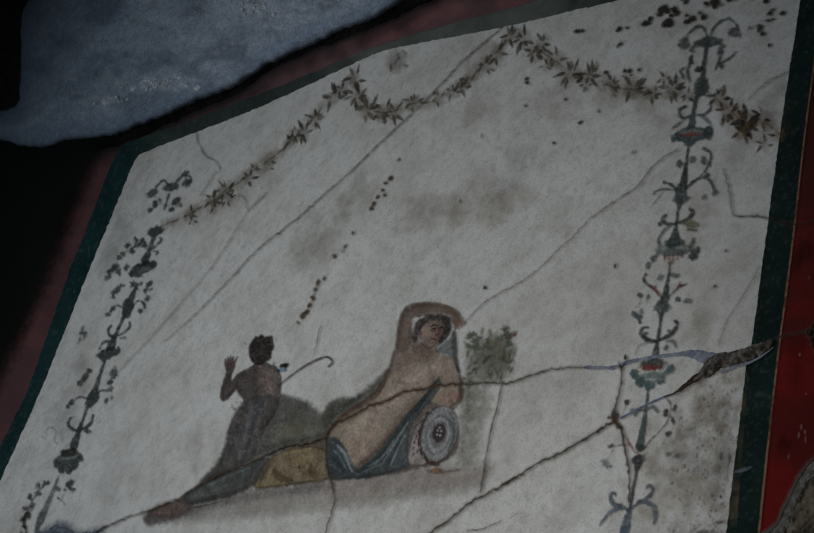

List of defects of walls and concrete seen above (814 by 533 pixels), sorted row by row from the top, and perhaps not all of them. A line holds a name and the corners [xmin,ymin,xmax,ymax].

peeling [641,0,730,28]
peeling [748,0,784,47]
crack [195,28,502,314]
crack [96,322,814,533]
spalling [38,522,100,533]
spalling [770,461,814,533]